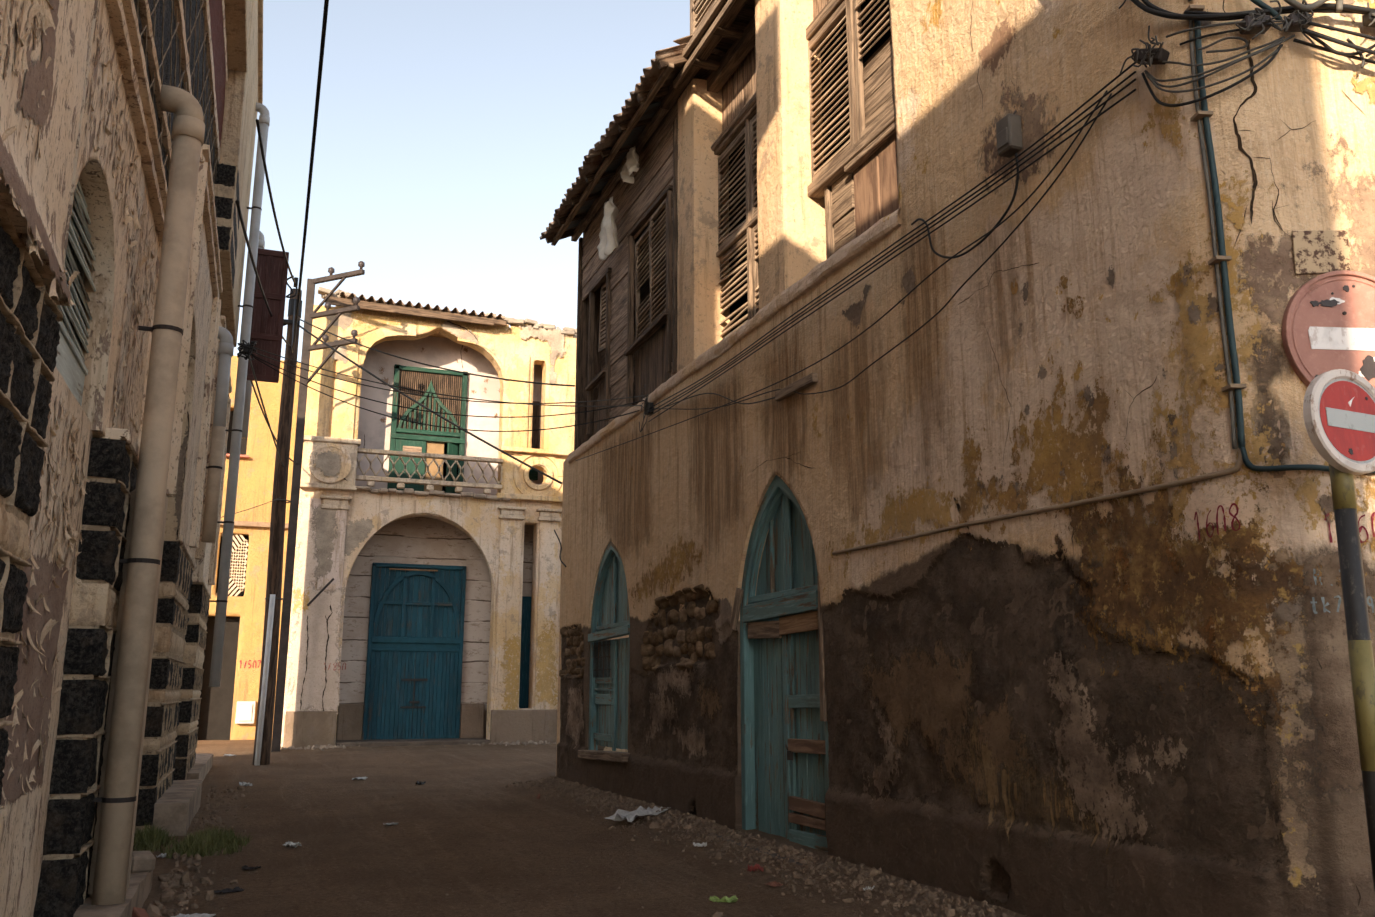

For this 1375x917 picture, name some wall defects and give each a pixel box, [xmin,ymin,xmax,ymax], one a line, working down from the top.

peeling [0,0,80,306]
crack [1233,40,1314,248]
peeling [1,395,90,818]
spalling [629,536,738,775]
damp [694,391,738,540]
spalling [822,166,1335,879]
peeling [1355,473,1375,577]